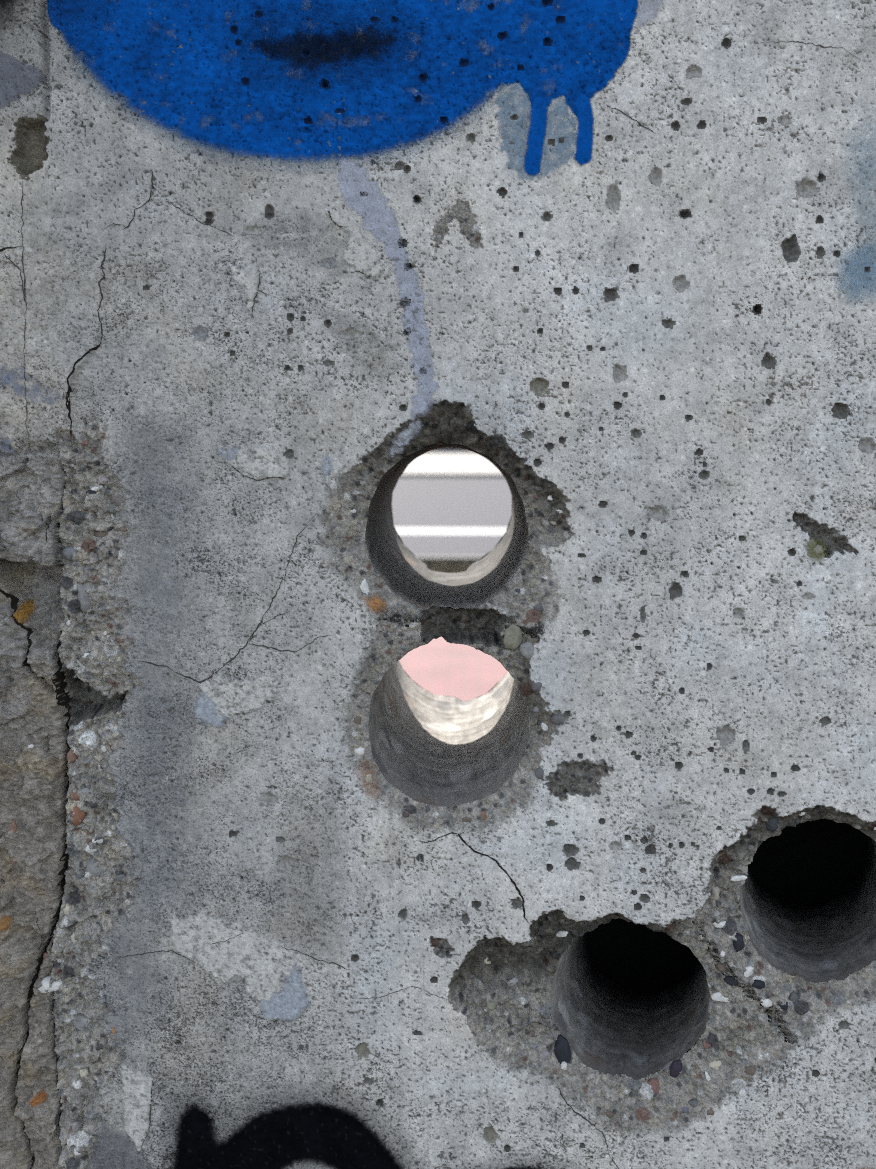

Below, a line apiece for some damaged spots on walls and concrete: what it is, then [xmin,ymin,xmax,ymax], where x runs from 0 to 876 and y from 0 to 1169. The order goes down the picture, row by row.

spalling [10,115,49,180]
crack [66,172,231,435]
crack [0,590,72,809]
crack [141,514,328,683]
spalling [318,400,614,831]
crack [15,840,69,1169]
crack [417,832,528,922]
spalling [430,805,876,1133]